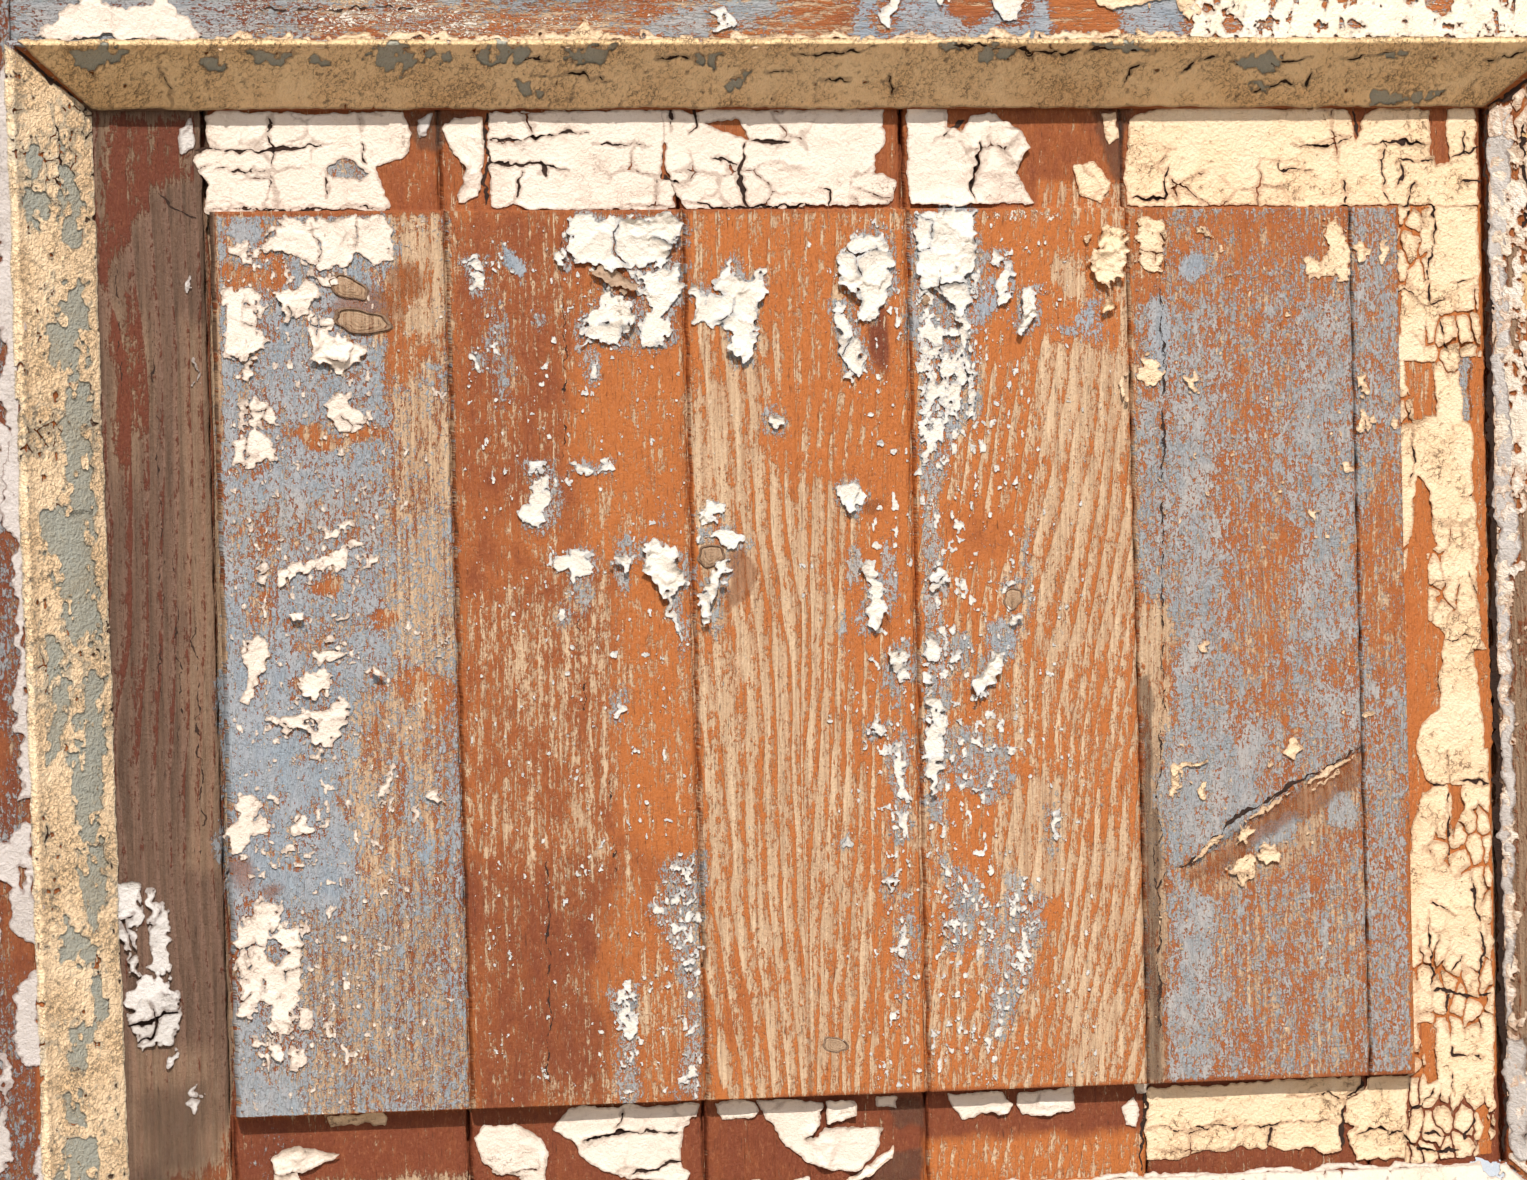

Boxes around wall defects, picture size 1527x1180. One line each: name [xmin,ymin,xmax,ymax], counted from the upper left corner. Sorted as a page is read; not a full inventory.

crack [513,56,607,82]
crack [660,53,689,61]
crack [769,45,894,93]
crack [953,42,1140,83]
crack [481,110,831,209]
peeling [0,60,173,1180]
peeling [35,0,1098,1180]
crack [1133,50,1527,1171]